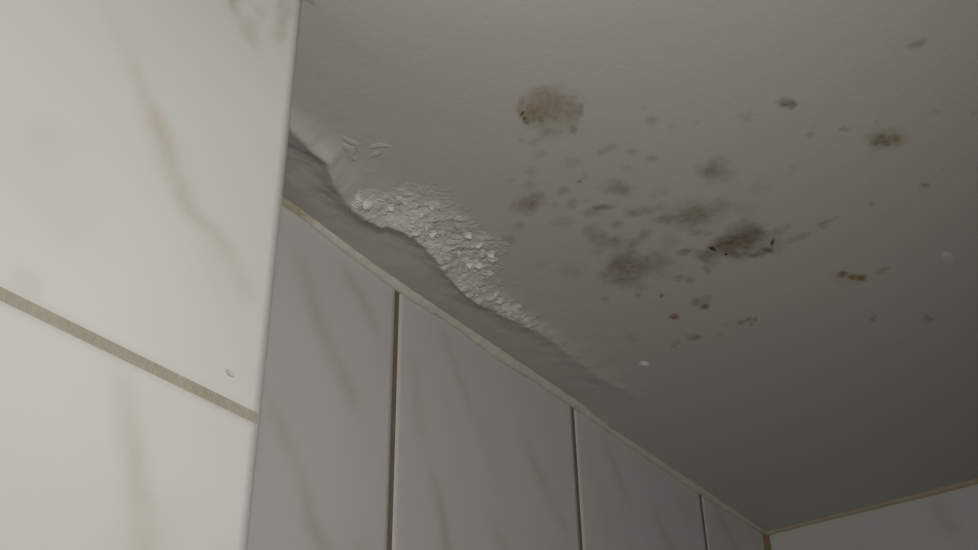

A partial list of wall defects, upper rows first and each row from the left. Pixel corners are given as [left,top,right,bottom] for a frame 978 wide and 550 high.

peeling [350,180,540,329]